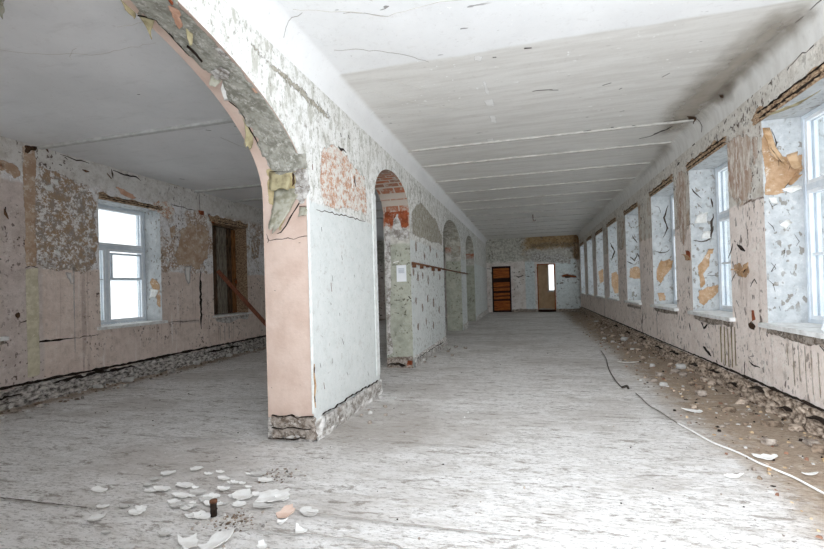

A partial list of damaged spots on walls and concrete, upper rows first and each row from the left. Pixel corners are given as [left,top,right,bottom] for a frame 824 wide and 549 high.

crack [284,0,458,35]
peeling [121,0,367,234]
spalling [22,145,99,274]
spalling [148,201,209,283]
peeling [384,203,447,368]
spalling [271,364,382,440]